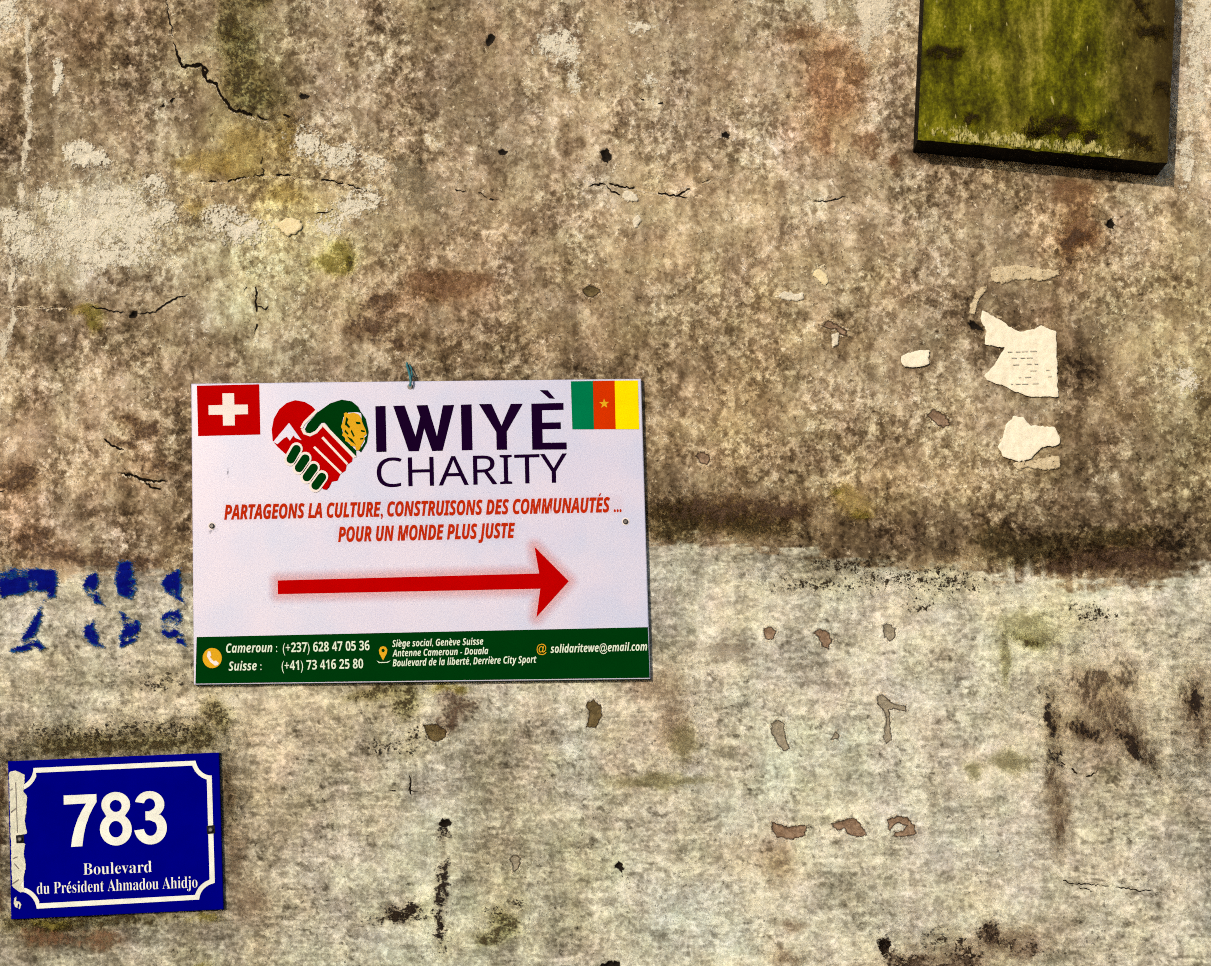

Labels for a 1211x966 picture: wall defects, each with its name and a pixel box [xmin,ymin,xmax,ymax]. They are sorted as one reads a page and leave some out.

crack [166,1,290,123]
leakage [215,0,281,118]
crack [0,294,187,314]
leakage [647,494,807,541]
spalling [586,699,604,728]
spalling [874,692,908,744]
leakage [1179,680,1209,744]
leakage [1041,658,1160,844]
spalling [770,821,810,841]
spalling [830,817,867,837]
spalling [885,814,918,837]
leakage [877,919,1059,966]